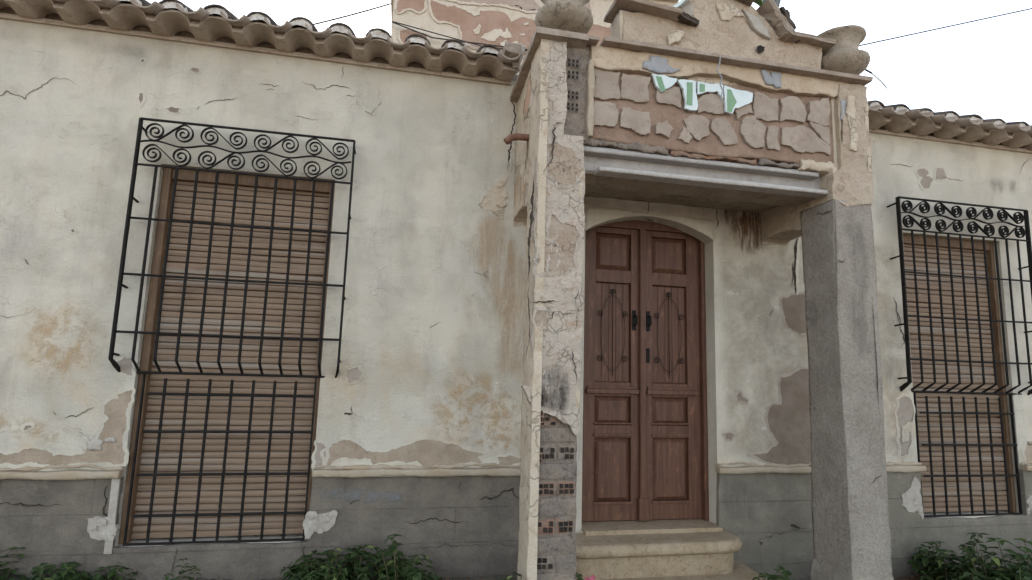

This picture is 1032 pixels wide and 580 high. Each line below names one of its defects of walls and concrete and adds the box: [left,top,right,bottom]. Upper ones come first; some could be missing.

peeling [394,0,542,58]
peeling [584,0,611,46]
crack [0,77,78,99]
peeling [0,354,138,470]
peeling [747,367,811,466]
peeling [311,436,521,470]